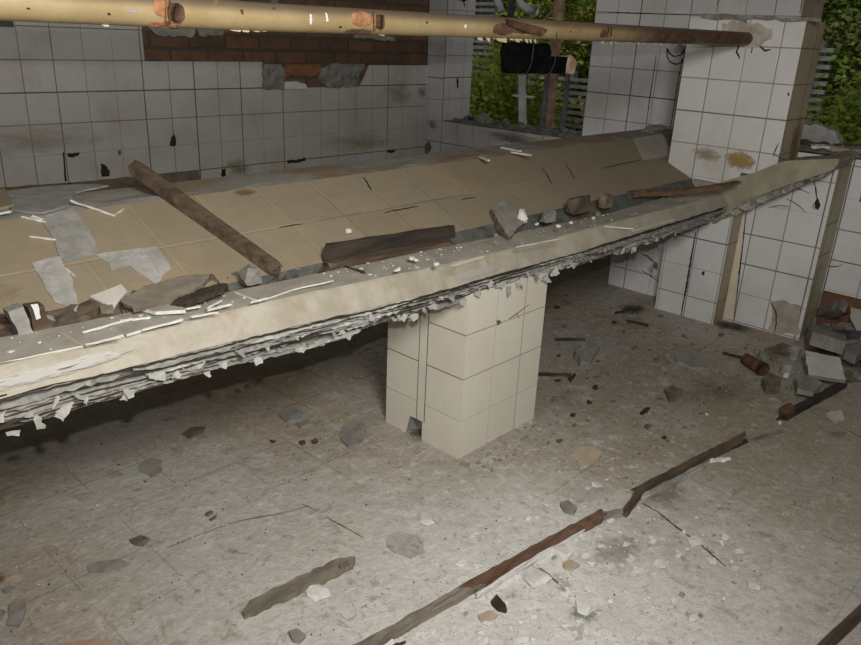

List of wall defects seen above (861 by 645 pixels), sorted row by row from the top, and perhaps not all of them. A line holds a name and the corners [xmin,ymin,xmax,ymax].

rust [148,0,180,28]
flaking render [142,0,429,90]
rust [344,11,376,35]
spalling [700,13,822,59]
water stain [698,151,755,167]
peeling [0,152,833,436]
crack [642,503,726,567]